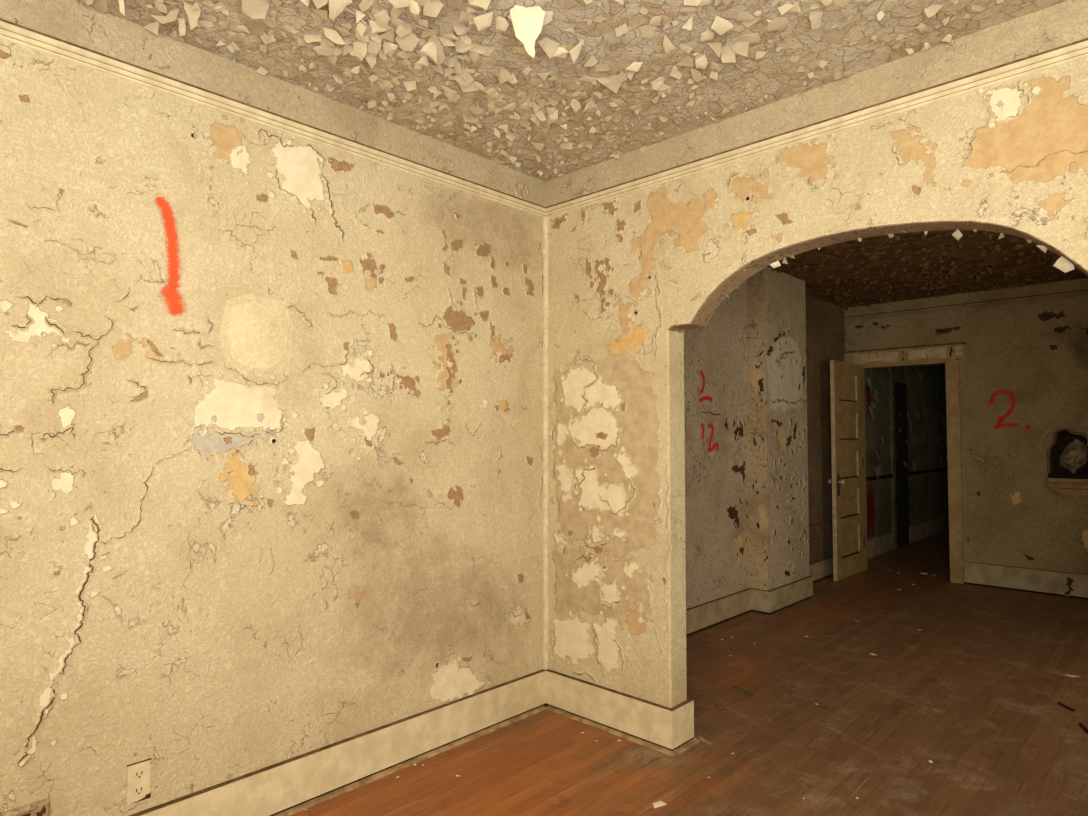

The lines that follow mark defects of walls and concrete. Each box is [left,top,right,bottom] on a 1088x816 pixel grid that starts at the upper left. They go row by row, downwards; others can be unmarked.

peeling [188,113,354,242]
peeling [80,0,1004,182]
peeling [957,71,1088,223]
peeling [0,293,331,516]
peeling [302,341,422,462]
peeling [316,251,415,297]
peeling [418,229,514,446]
peeling [548,133,841,682]
peeling [767,229,1083,311]
flaking render [1051,431,1088,475]
crack [12,445,194,770]
peeling [423,648,493,705]